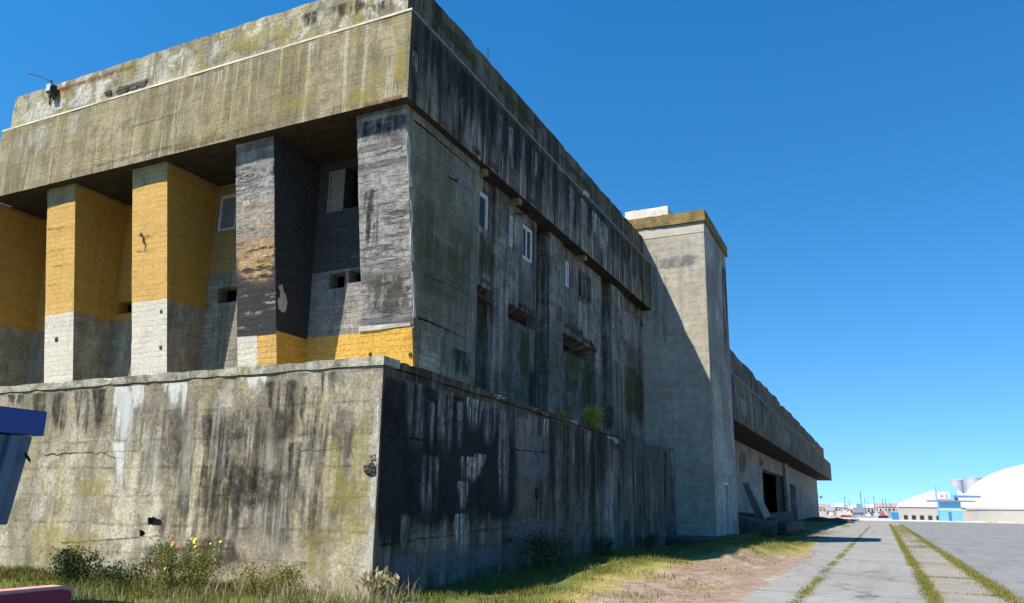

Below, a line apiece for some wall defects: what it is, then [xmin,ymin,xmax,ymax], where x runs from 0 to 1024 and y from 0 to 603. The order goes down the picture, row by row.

leakage [413,30,634,276]
crack [45,450,137,459]
leakage [147,376,352,571]
leakage [453,235,492,374]
leakage [378,378,621,576]
leakage [624,367,643,422]